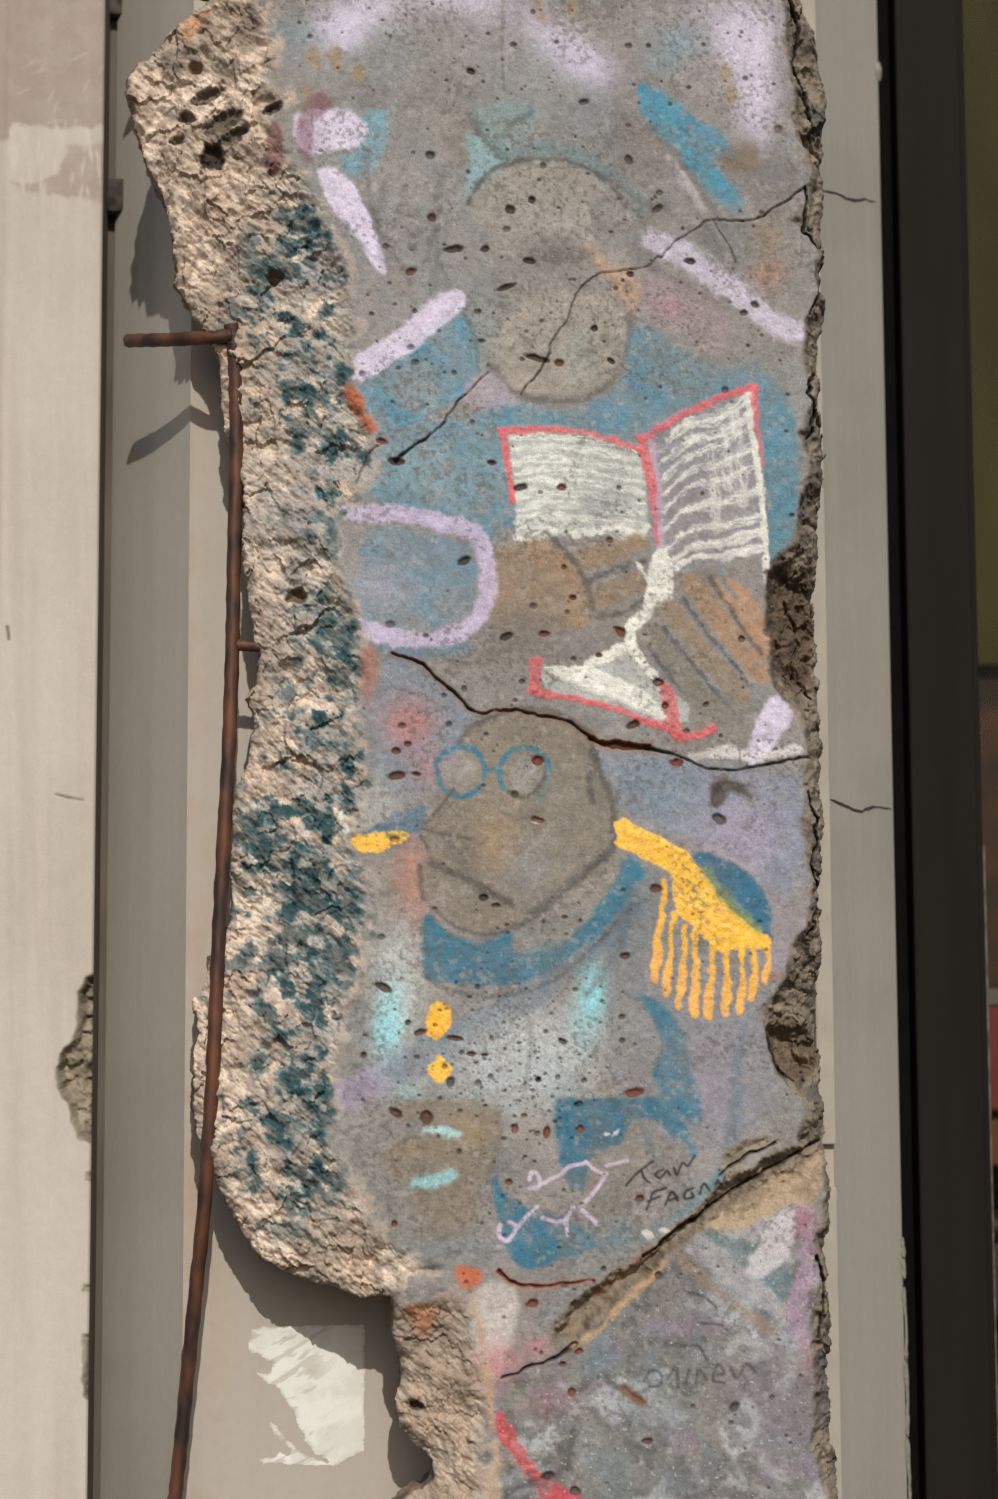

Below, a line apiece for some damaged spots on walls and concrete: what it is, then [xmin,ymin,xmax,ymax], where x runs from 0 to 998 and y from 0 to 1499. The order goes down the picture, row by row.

crack [823,190,876,202]
crack [830,799,891,813]